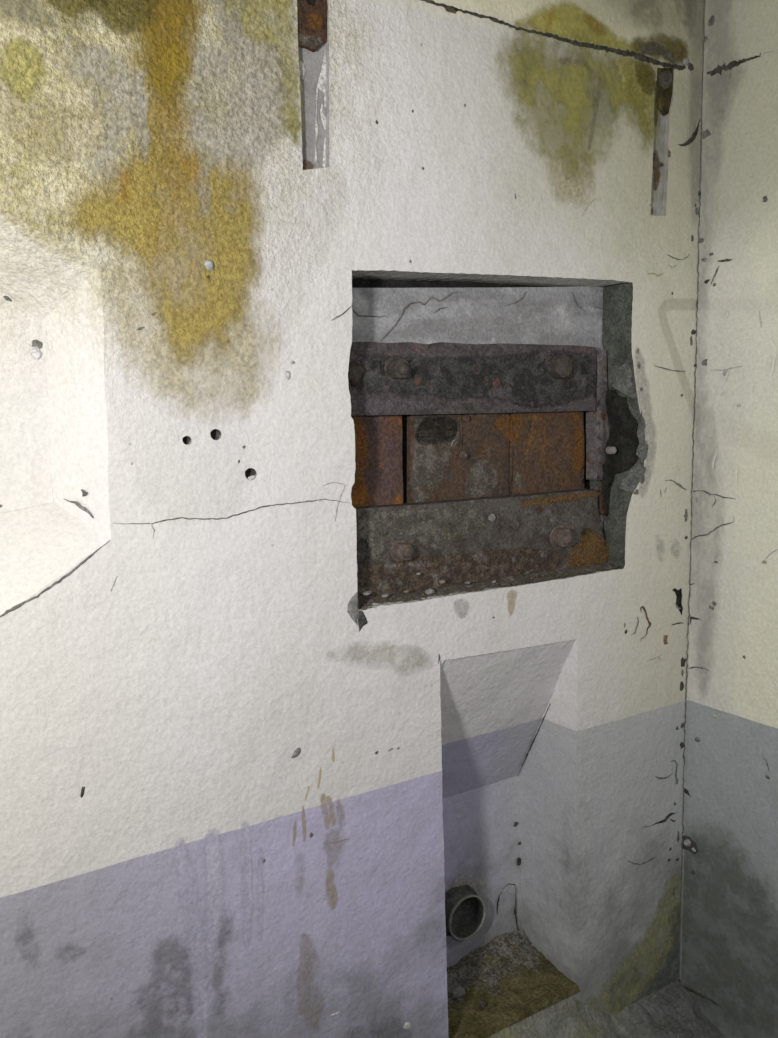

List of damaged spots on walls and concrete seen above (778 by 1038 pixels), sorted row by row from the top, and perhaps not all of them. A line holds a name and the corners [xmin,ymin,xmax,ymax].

leakage [0,40,44,123]
leakage [509,3,687,199]
leakage [49,0,300,399]
corrosion [653,150,671,190]
crack [332,292,457,339]
corrosion [354,422,370,493]
crack [421,0,778,1006]
spalling [602,348,648,508]
crack [0,482,349,617]
corrosion [357,547,562,596]
corrosion [293,769,330,846]
leakage [635,911,681,1002]